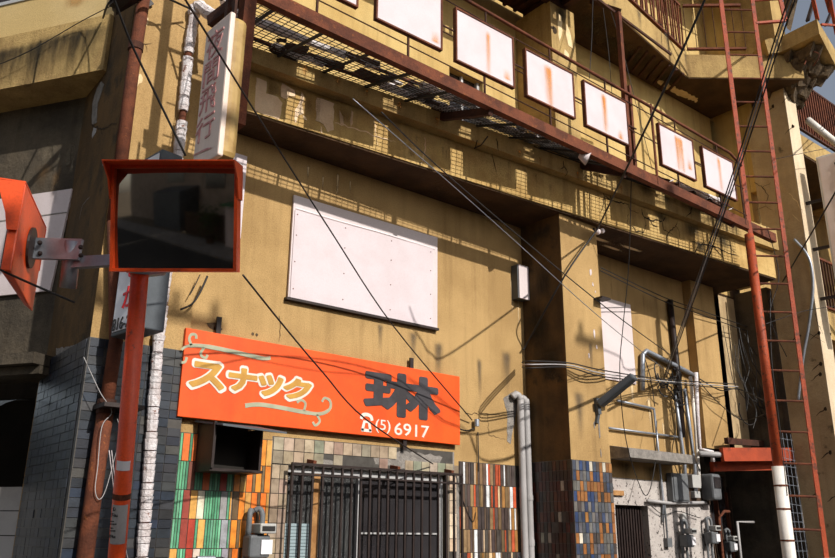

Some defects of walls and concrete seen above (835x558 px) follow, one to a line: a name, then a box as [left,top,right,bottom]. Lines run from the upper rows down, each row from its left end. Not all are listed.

leakage [34,28,96,57]
peeling [255,77,353,133]